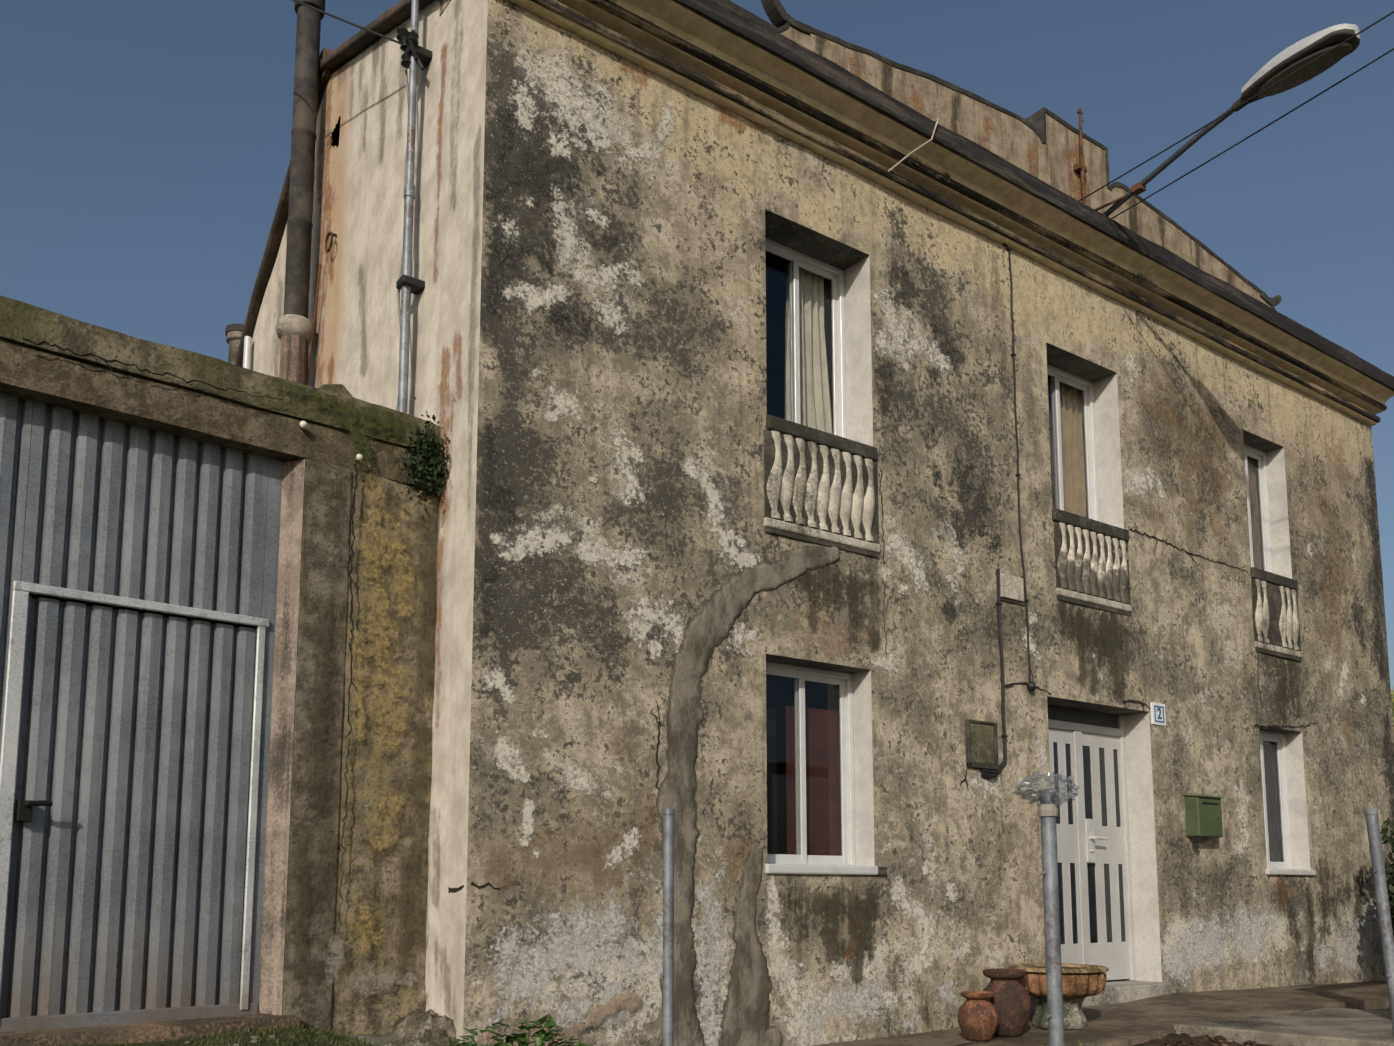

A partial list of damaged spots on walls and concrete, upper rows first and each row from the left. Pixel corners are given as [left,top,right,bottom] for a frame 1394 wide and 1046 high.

corrosion [314,80,334,387]
corrosion [434,45,446,279]
water stain [485,107,606,317]
peeling [502,184,641,335]
peeling [507,56,675,169]
crack [338,463,359,934]
water stain [416,500,437,692]
corrosion [435,335,461,662]
peeling [490,520,649,571]
peeling [610,428,646,505]
crack [650,545,840,1046]
water stain [779,883,961,1046]